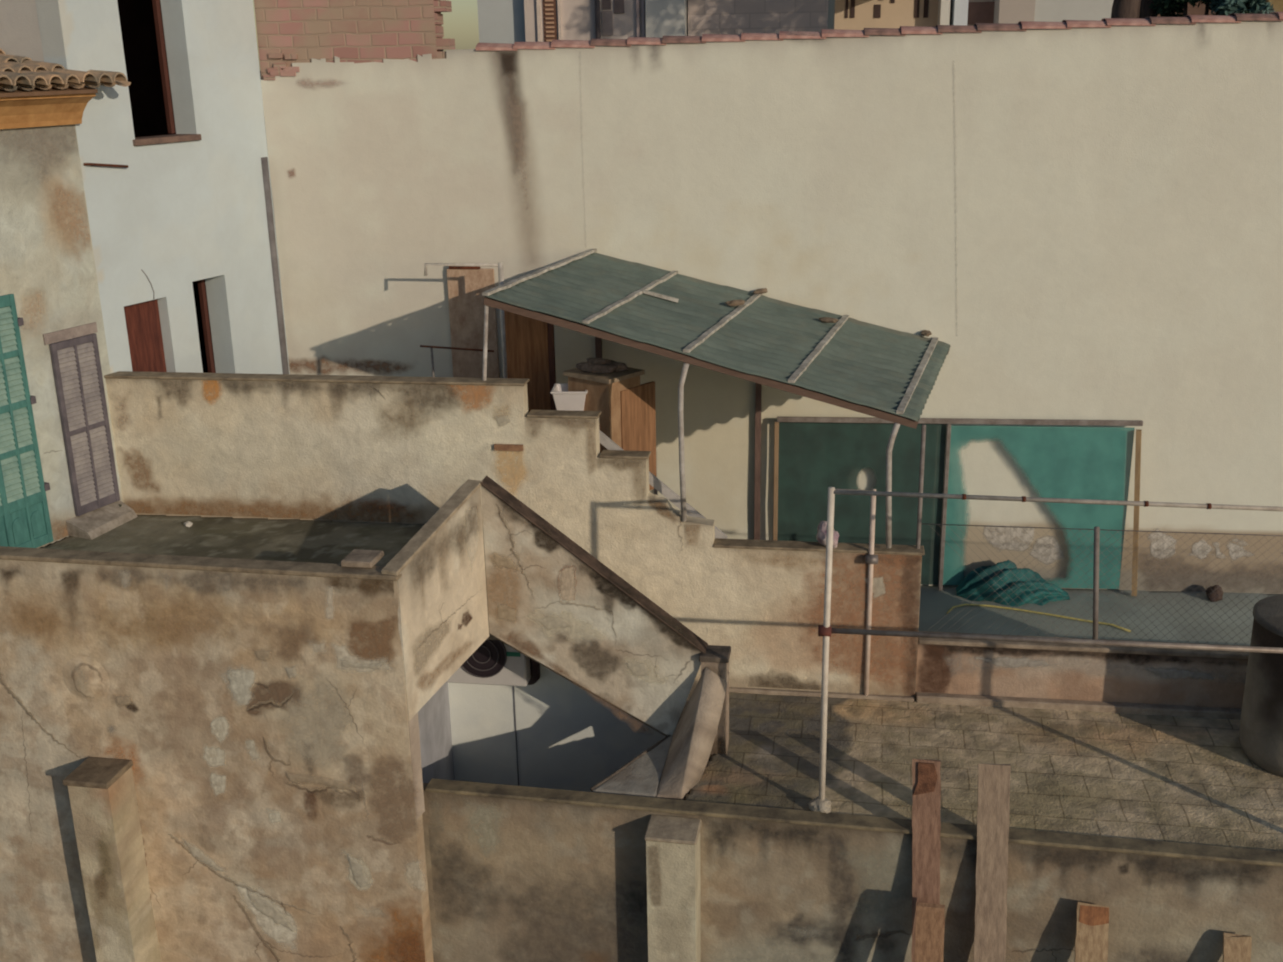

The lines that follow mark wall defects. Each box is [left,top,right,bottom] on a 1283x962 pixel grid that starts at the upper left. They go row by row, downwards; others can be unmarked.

spalling [263,53,300,80]
water stain [500,53,527,190]
peeling [984,525,1063,564]
peeling [1148,528,1254,560]
crack [0,674,82,759]
flaking render [228,651,301,715]
crack [263,737,363,808]
crack [169,834,356,962]
water stain [750,824,900,962]